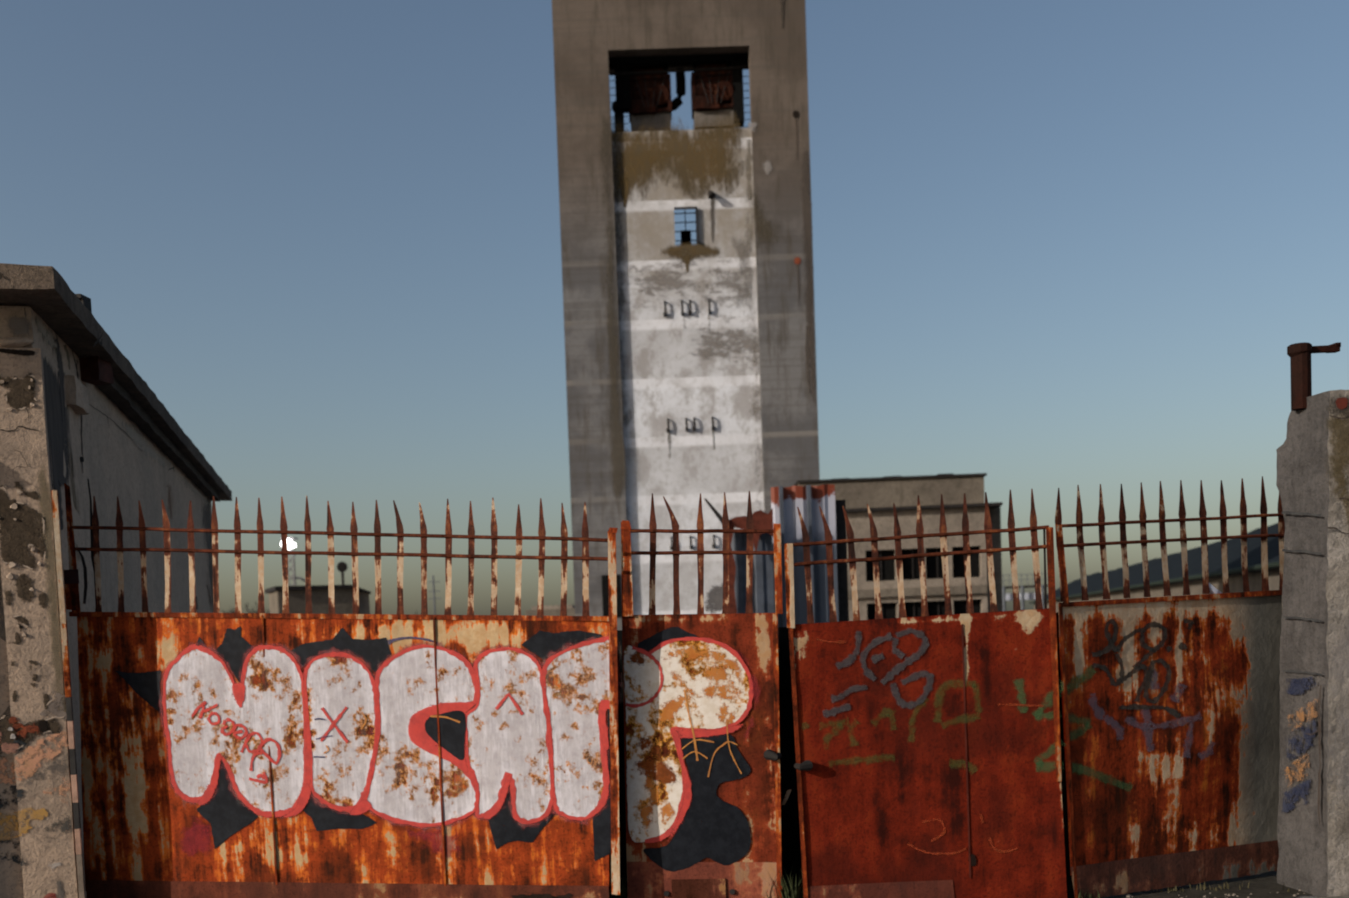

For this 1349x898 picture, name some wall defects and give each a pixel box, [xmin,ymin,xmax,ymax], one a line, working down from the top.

water stain [600,119,772,497]
spalling [0,373,37,411]
spalling [0,481,48,645]
spalling [0,660,67,754]